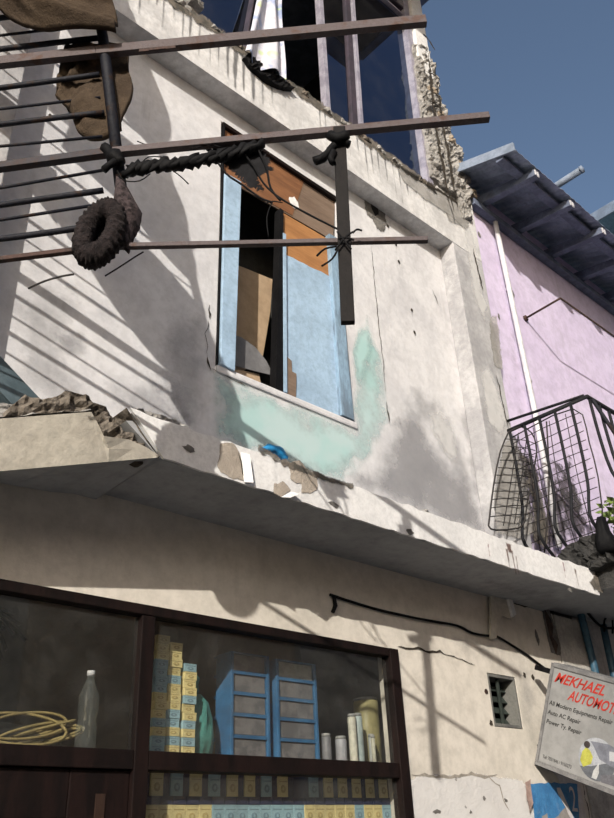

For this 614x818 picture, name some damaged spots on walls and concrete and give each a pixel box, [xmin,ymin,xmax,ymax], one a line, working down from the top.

spalling [168,0,225,34]
spalling [274,69,352,125]
flaking render [412,35,448,118]
flaking render [357,127,505,431]
spalling [0,390,159,459]
peeling [217,443,354,498]
damp [382,420,480,528]
peeling [494,437,549,547]
crack [398,646,472,664]